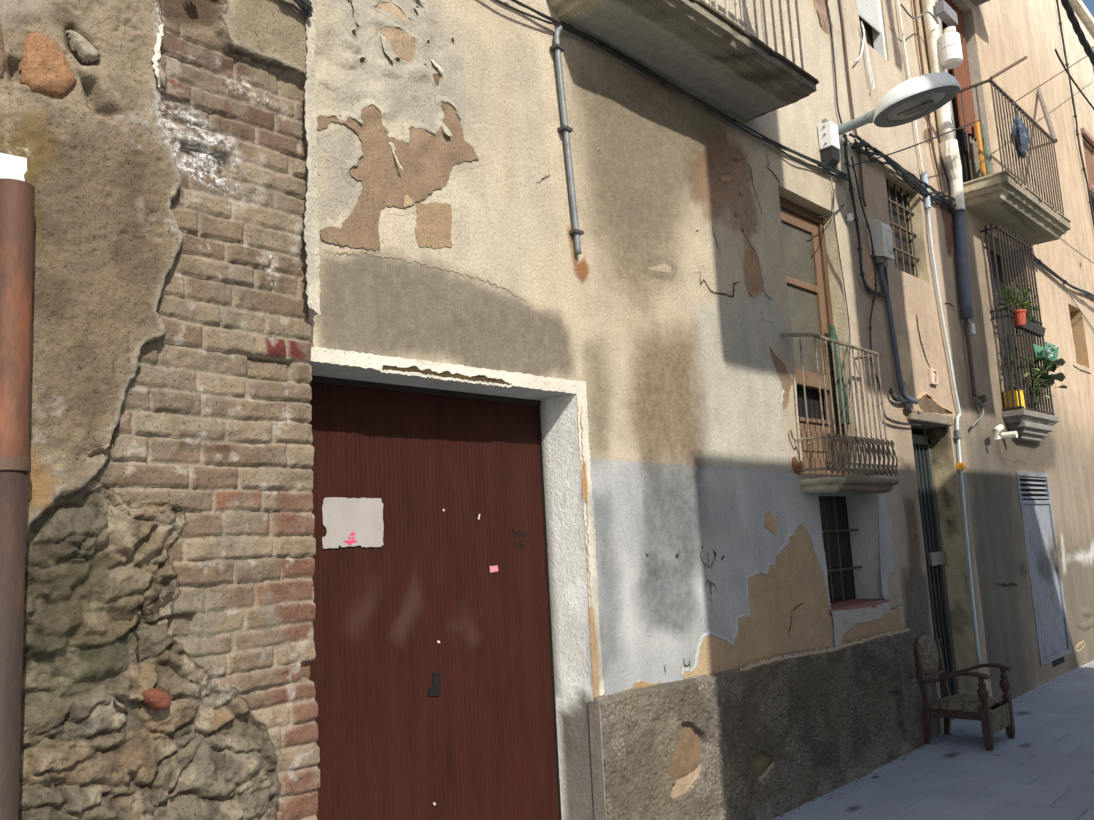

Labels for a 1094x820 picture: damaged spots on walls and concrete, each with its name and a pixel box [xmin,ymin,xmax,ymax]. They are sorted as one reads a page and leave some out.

efflorescence [157,95,240,193]
rust [570,227,588,281]
damp [588,81,762,293]
crack [698,148,780,301]
damp [321,253,571,375]
spalling [18,0,483,820]
spalling [379,362,513,388]
damp [636,342,700,459]
peeling [767,344,795,416]
spalling [915,391,953,416]
peeling [681,509,903,679]